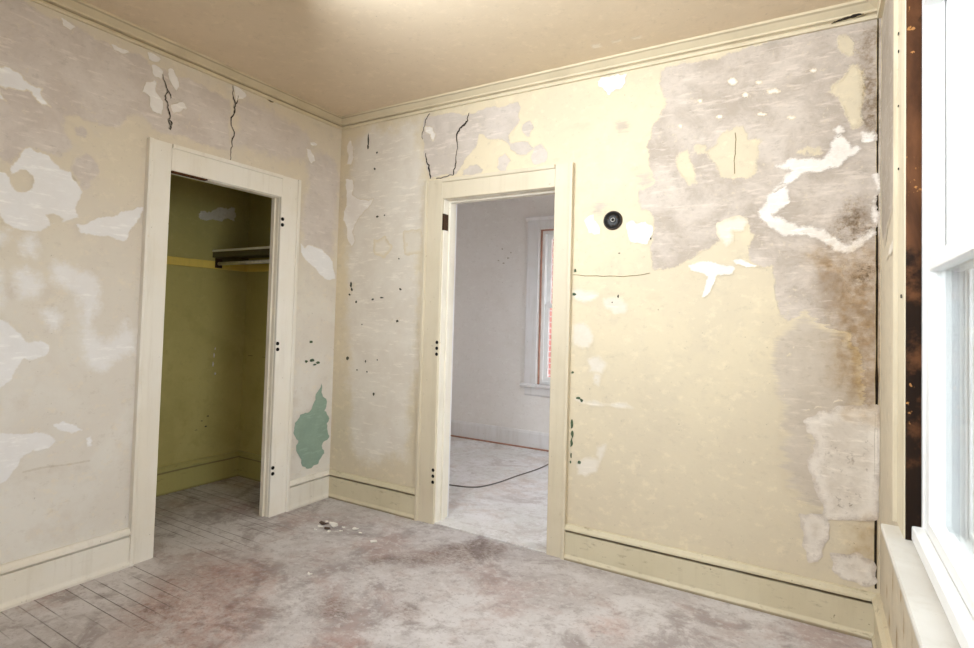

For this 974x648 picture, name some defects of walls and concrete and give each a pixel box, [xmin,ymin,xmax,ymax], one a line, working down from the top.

crack [162,74,173,130]
crack [230,86,239,160]
crack [422,113,470,179]
peeling [597,74,627,95]
peeling [0,0,548,484]
peeling [583,195,609,235]
peeling [625,0,893,587]